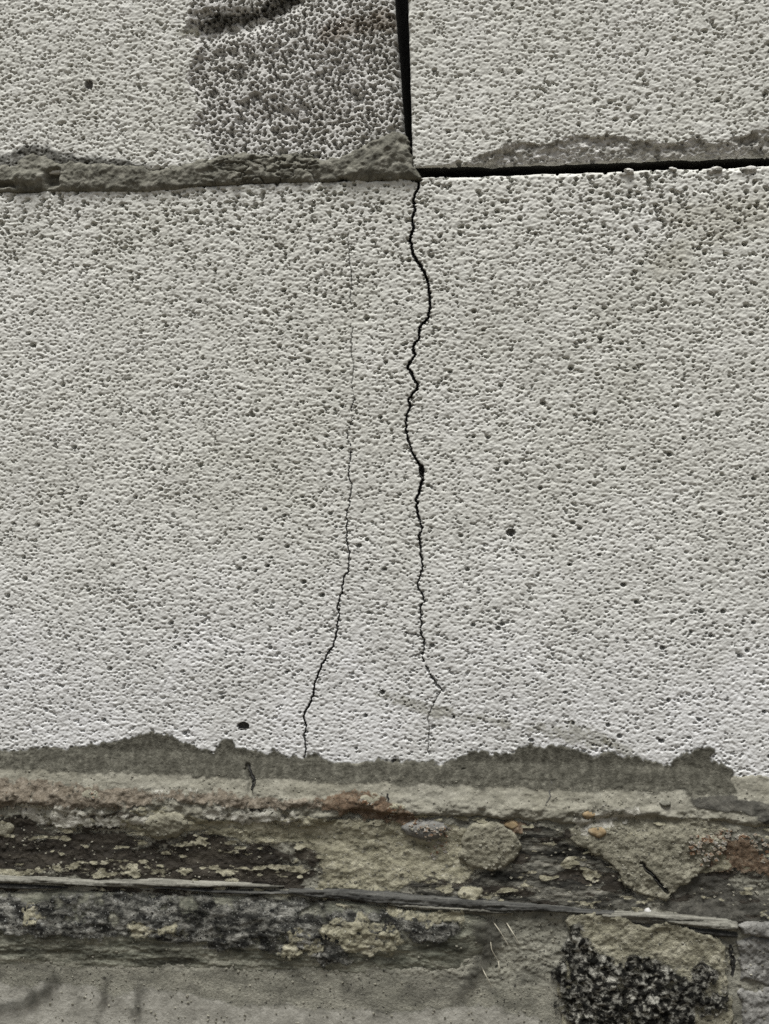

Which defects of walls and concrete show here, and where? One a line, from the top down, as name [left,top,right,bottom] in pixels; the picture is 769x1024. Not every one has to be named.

crack [405,181,442,755]
crack [303,329,355,758]
rust [314,789,423,826]
damp [0,731,769,901]
rust [709,834,769,877]
damp [480,885,560,912]
damp [659,866,769,924]